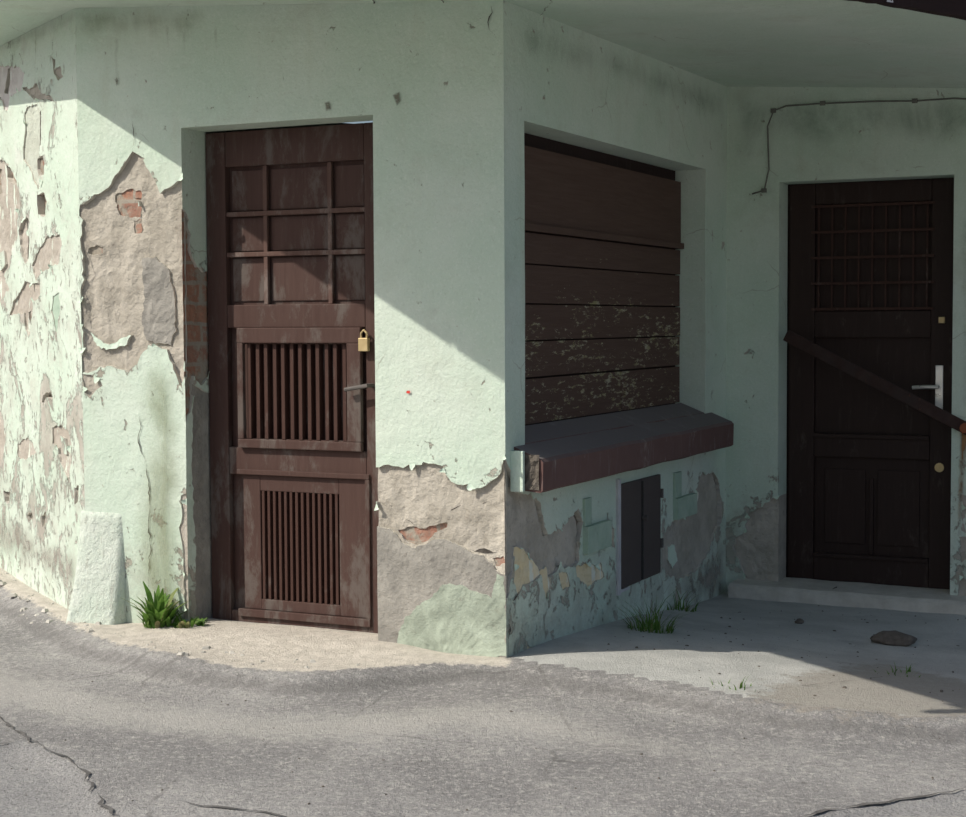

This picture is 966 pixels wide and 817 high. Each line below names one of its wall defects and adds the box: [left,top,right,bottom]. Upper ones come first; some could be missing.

peeling [0,66,54,209]
spalling [0,160,62,334]
peeling [18,438,36,459]
spalling [78,153,212,620]
spalling [374,455,603,658]
spalling [662,471,717,581]
spalling [734,494,786,581]